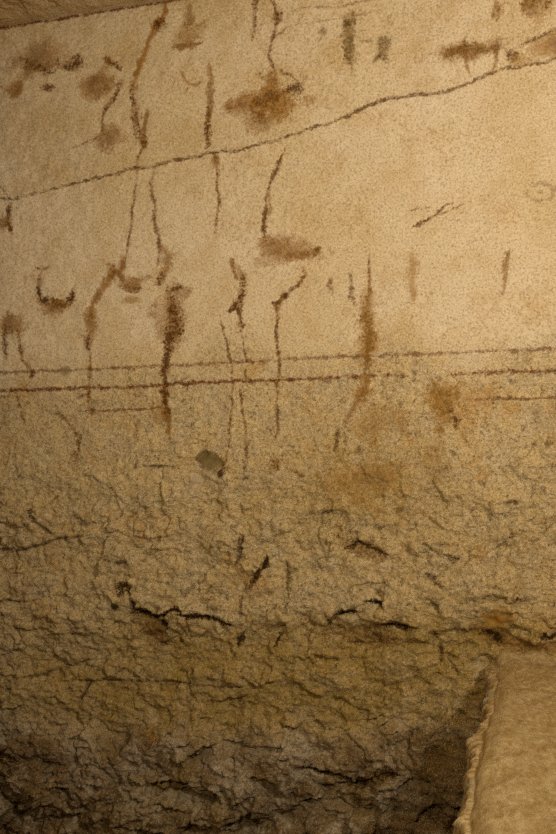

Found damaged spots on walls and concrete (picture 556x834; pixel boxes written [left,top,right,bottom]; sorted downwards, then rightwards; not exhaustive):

crack [3,30,556,236]
crack [235,536,291,609]
crack [237,631,246,647]
crack [433,633,444,663]
crack [0,747,18,762]
crack [303,765,400,790]
crack [443,817,457,833]